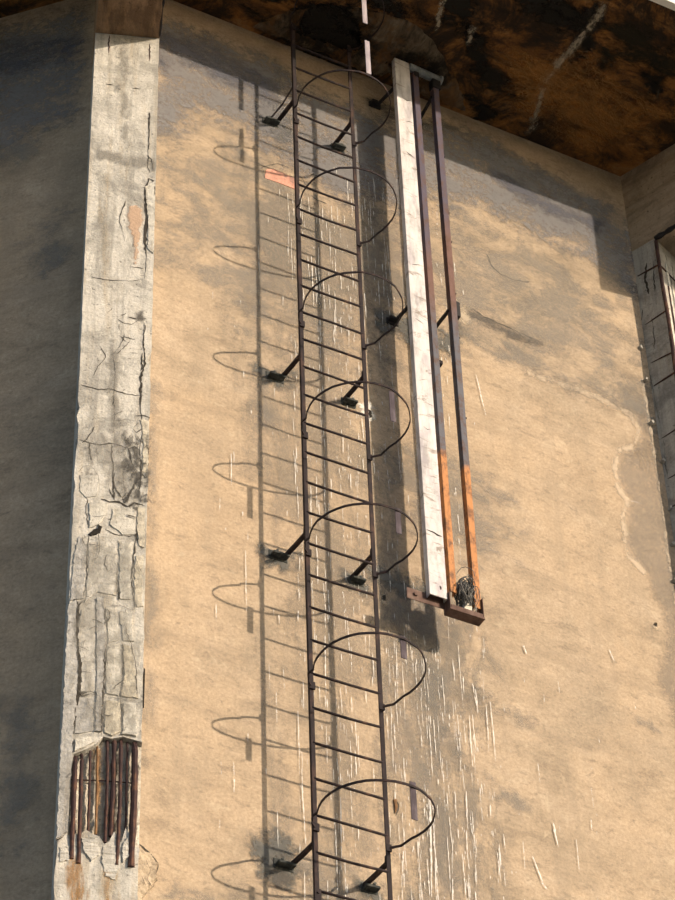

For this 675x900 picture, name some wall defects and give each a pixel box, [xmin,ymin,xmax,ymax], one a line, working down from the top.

peeling [119,181,155,269]
flaking render [263,169,295,190]
damp [422,121,638,294]
damp [514,0,675,96]
crack [73,309,150,734]
damp [310,398,426,711]
damp [432,251,645,550]
spalling [59,502,159,900]
damp [327,722,383,900]
damp [386,610,504,900]